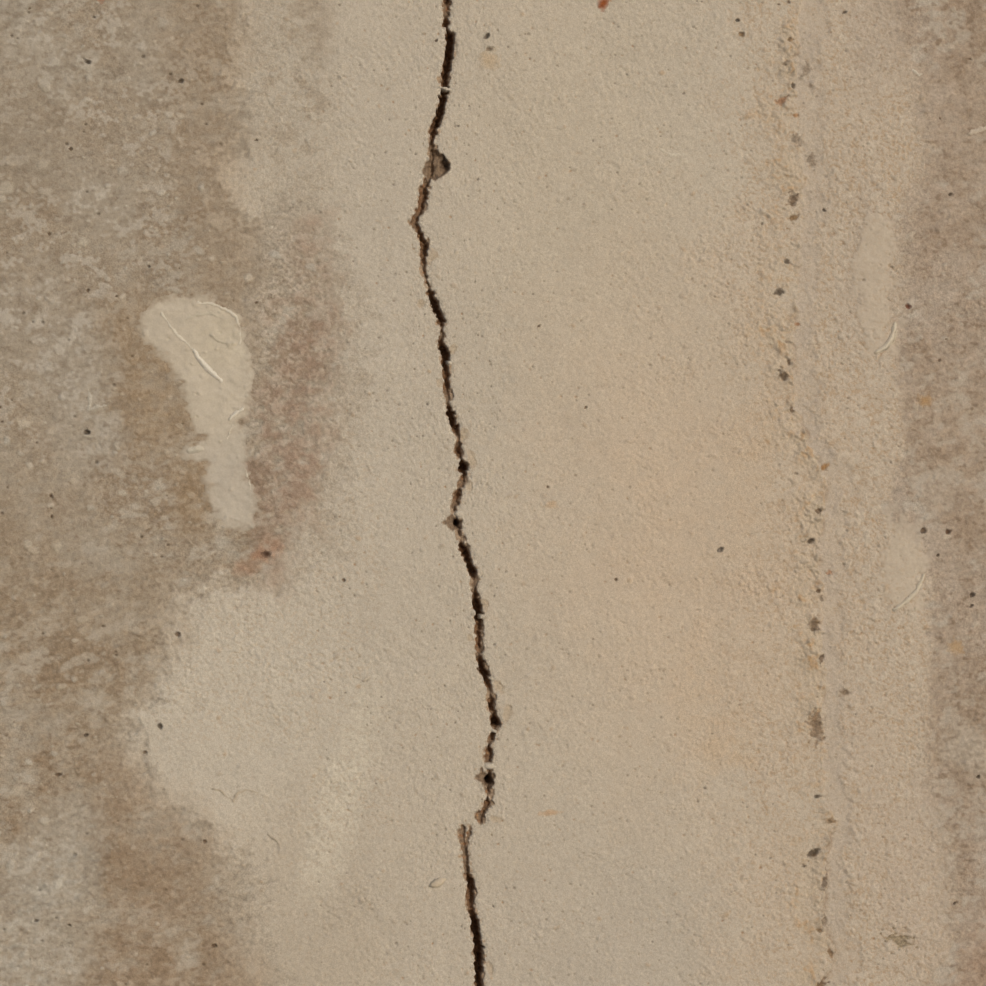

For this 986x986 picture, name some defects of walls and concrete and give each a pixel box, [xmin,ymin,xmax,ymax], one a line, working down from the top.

leakage [0,0,362,986]
crack [406,0,514,986]